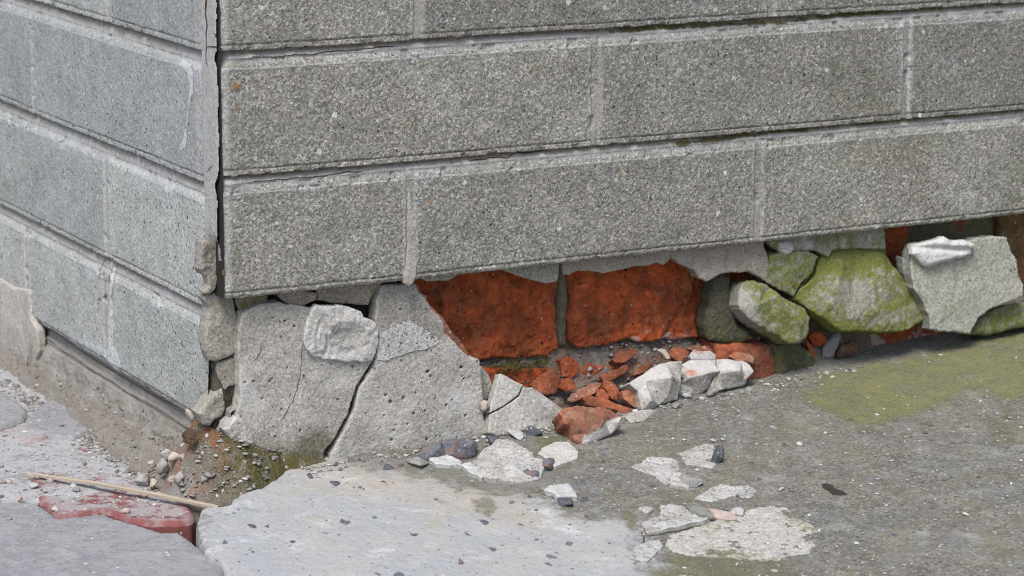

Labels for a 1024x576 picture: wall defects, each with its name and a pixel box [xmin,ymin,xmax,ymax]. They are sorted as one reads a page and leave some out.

crack [205,0,394,300]
flaking render [895,235,1023,334]
crack [281,343,303,421]
crack [324,361,372,453]
flaking render [218,281,699,459]
spalling [797,318,873,362]
peeling [537,442,578,470]